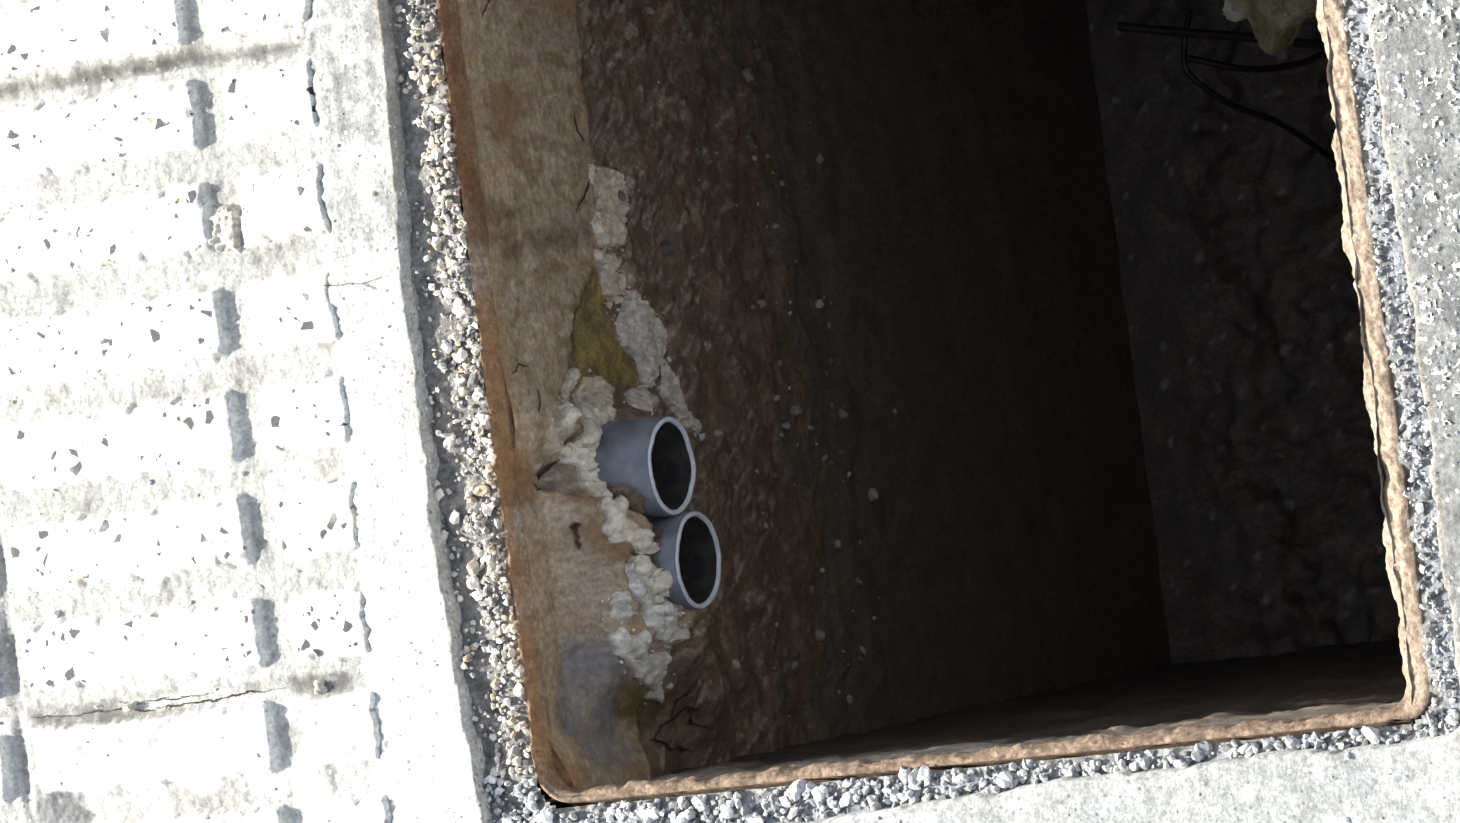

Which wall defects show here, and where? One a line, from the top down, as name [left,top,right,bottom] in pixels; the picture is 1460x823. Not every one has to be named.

crack [39,688,282,718]
spalling [436,0,1440,807]